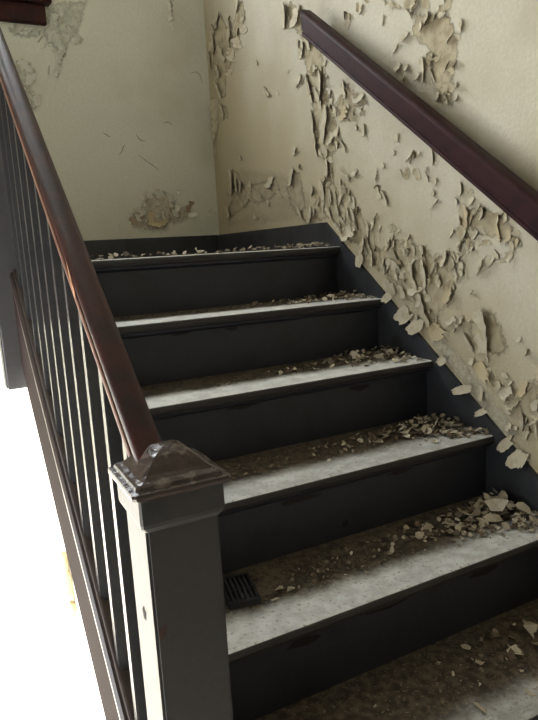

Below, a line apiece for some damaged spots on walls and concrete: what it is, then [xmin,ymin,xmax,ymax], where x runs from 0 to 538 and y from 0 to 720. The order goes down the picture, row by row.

peeling [10,2,84,77]
peeling [206,0,248,155]
peeling [129,189,197,229]
peeling [223,0,538,469]